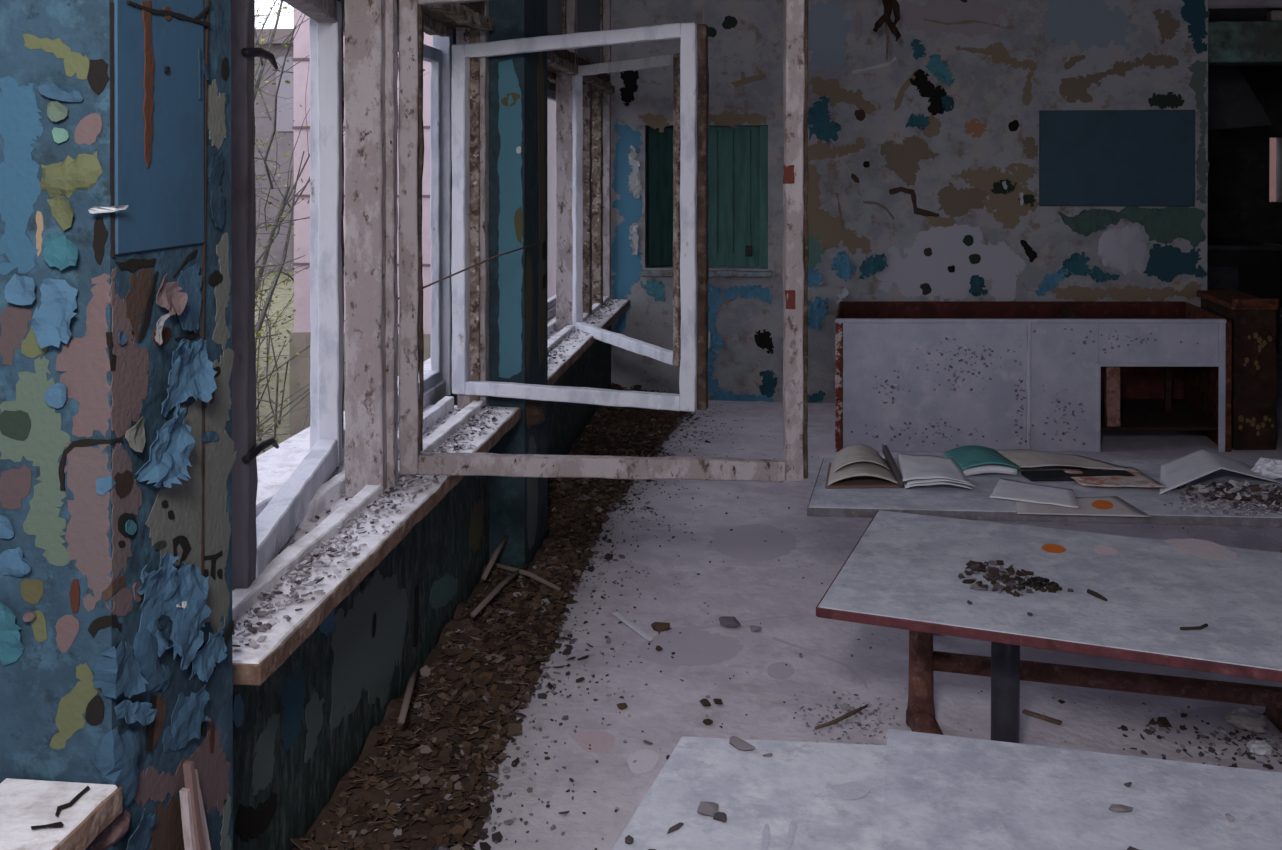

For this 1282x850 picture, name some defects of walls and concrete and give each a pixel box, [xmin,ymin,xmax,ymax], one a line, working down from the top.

peeling [611,121,666,333]
peeling [807,96,841,145]
spalling [854,109,866,121]
peeling [808,224,1037,331]
spalling [905,39,954,138]
peeling [991,179,1035,207]
peeling [1035,0,1210,301]
peeling [708,283,777,402]
peeling [0,34,244,850]